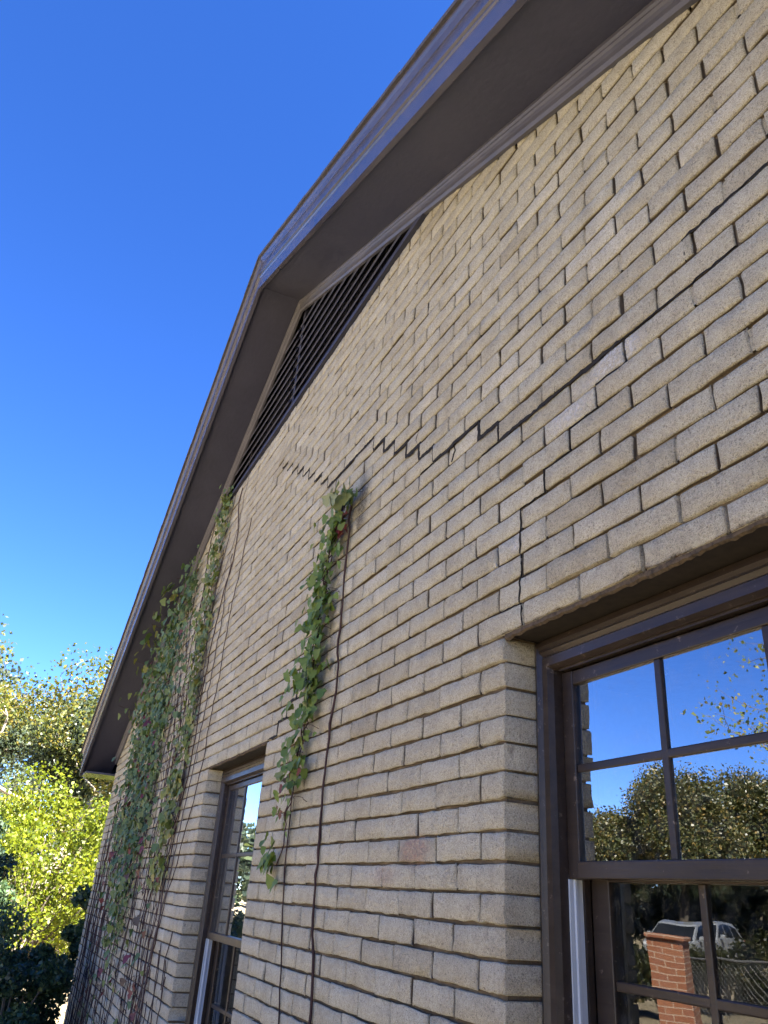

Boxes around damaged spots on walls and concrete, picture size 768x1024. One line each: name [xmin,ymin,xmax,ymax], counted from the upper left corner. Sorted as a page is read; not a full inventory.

crack [282,161,768,625]